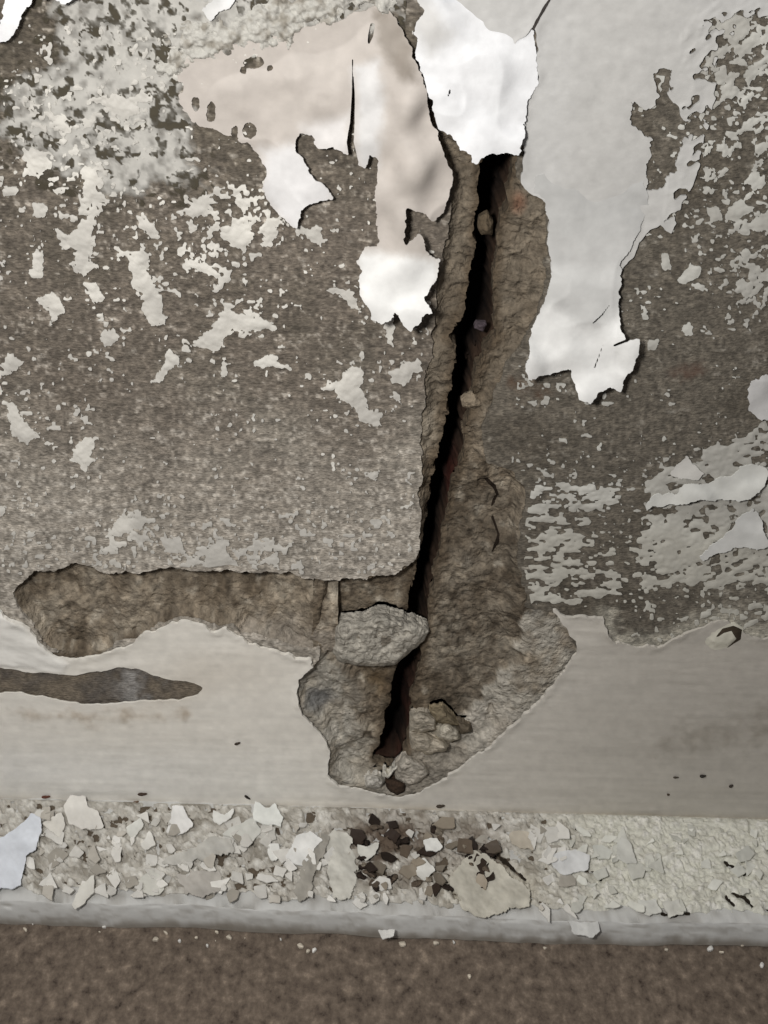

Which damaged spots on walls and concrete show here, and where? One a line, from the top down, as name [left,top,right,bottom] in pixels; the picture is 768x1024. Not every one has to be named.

crack [532,0,550,30]
peeling [0,0,768,797]
crack [407,153,510,620]
crack [374,645,421,758]